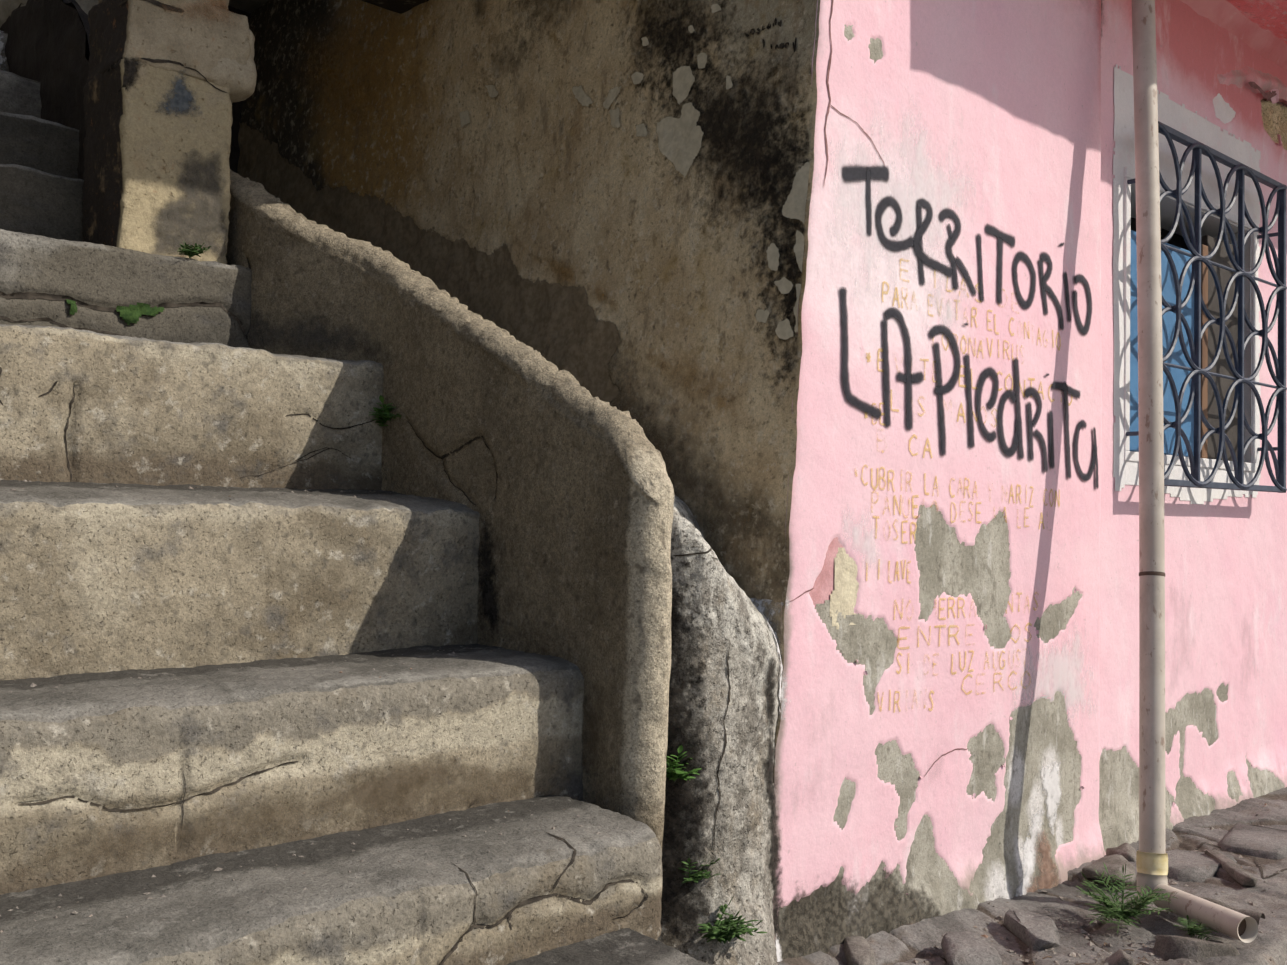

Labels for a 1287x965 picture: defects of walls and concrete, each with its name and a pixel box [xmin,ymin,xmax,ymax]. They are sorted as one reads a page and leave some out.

flaking render [572,52,707,178]
crack [824,0,885,184]
water stain [762,128,808,389]
water stain [246,312,380,356]
water stain [609,373,722,524]
water stain [478,524,499,631]
peeling [914,504,1012,649]
crack [18,761,299,847]
crack [440,831,648,965]
crack [713,643,731,856]
peeling [775,691,1139,962]
peeling [1165,683,1285,830]